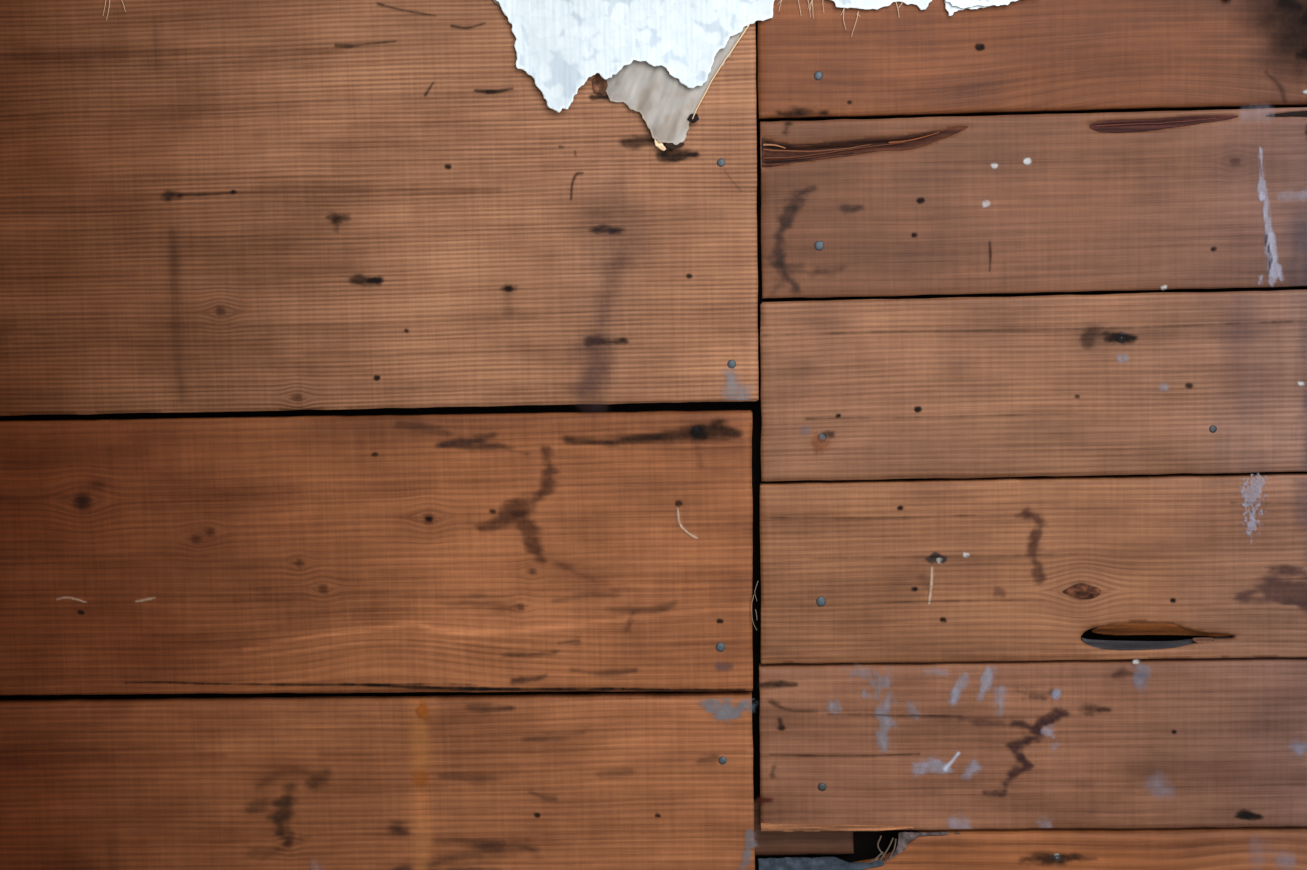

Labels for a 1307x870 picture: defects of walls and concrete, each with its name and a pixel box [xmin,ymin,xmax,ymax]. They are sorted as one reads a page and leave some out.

spalling [1089,115,1238,133]
spalling [762,126,968,167]
leakage [1239,566,1307,608]